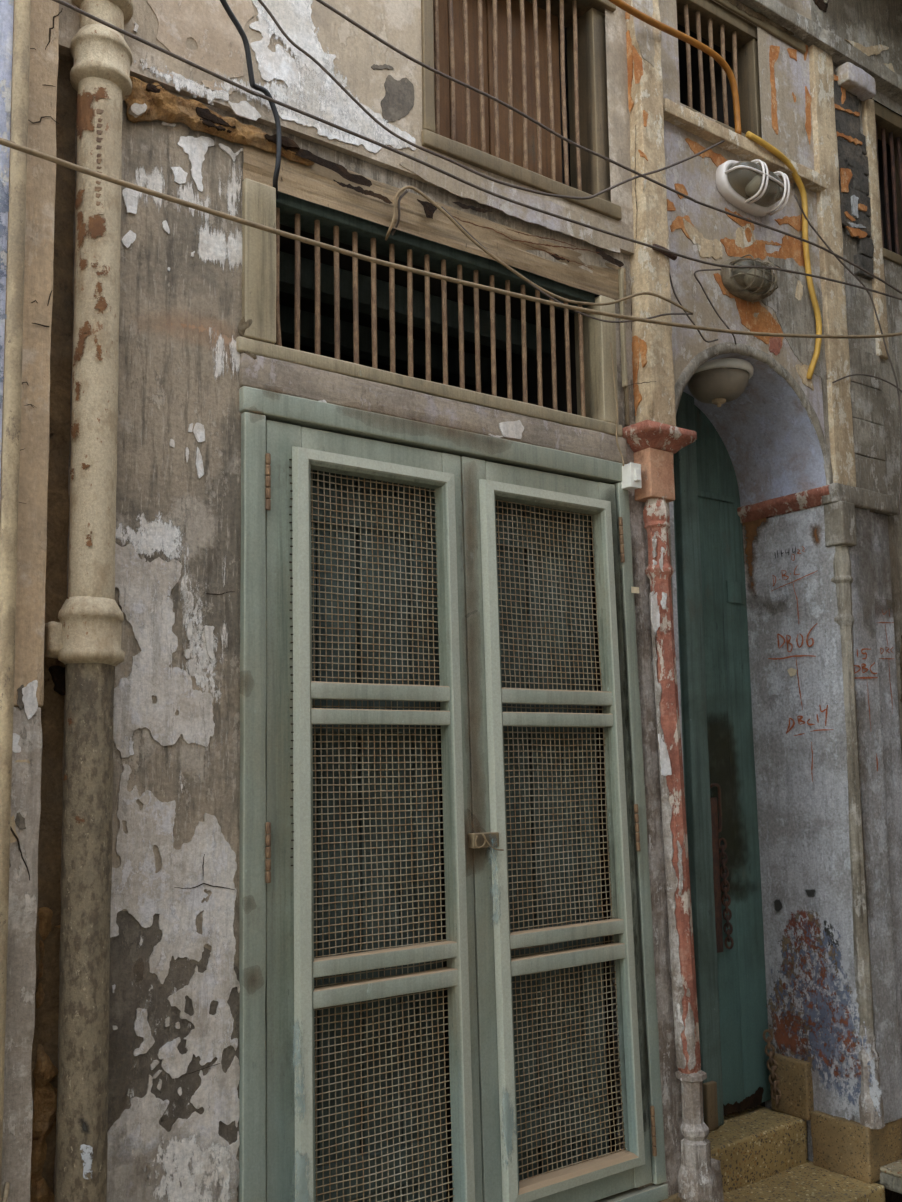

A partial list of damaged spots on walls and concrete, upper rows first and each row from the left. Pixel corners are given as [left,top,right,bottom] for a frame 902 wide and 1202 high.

rust [76,87,109,139]
peeling [685,138,728,167]
flaking render [834,74,874,280]
rust [73,189,108,401]
peeling [209,317,257,380]
peeling [667,183,827,391]
peeling [107,511,240,1202]
peeling [766,889,885,1126]